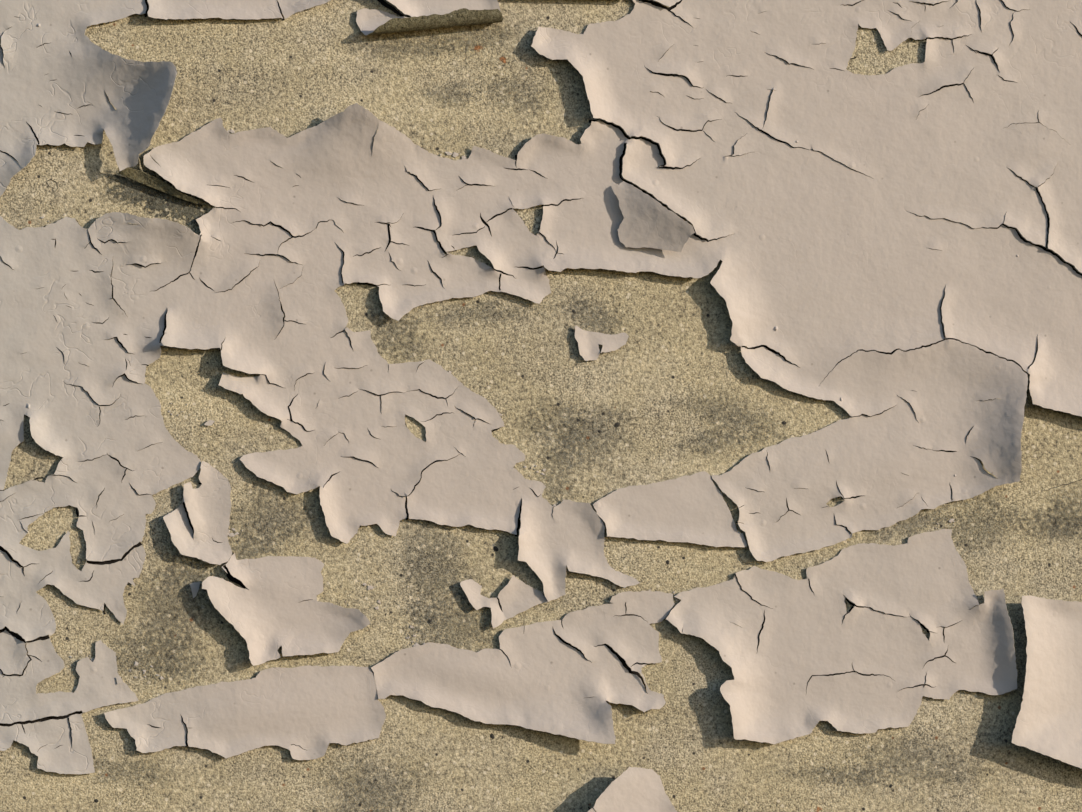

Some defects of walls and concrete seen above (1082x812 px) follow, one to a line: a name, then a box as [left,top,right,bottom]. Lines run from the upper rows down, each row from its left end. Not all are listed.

crack [890,0,1030,117]
crack [39,155,545,426]
peeling [0,0,850,513]
crack [495,198,581,290]
crack [740,285,1038,384]
crack [910,168,1082,276]
crack [259,330,500,488]
crack [80,542,142,582]
crack [183,482,249,590]
peeling [0,327,1082,812]
crack [0,596,49,677]
crack [806,597,972,691]